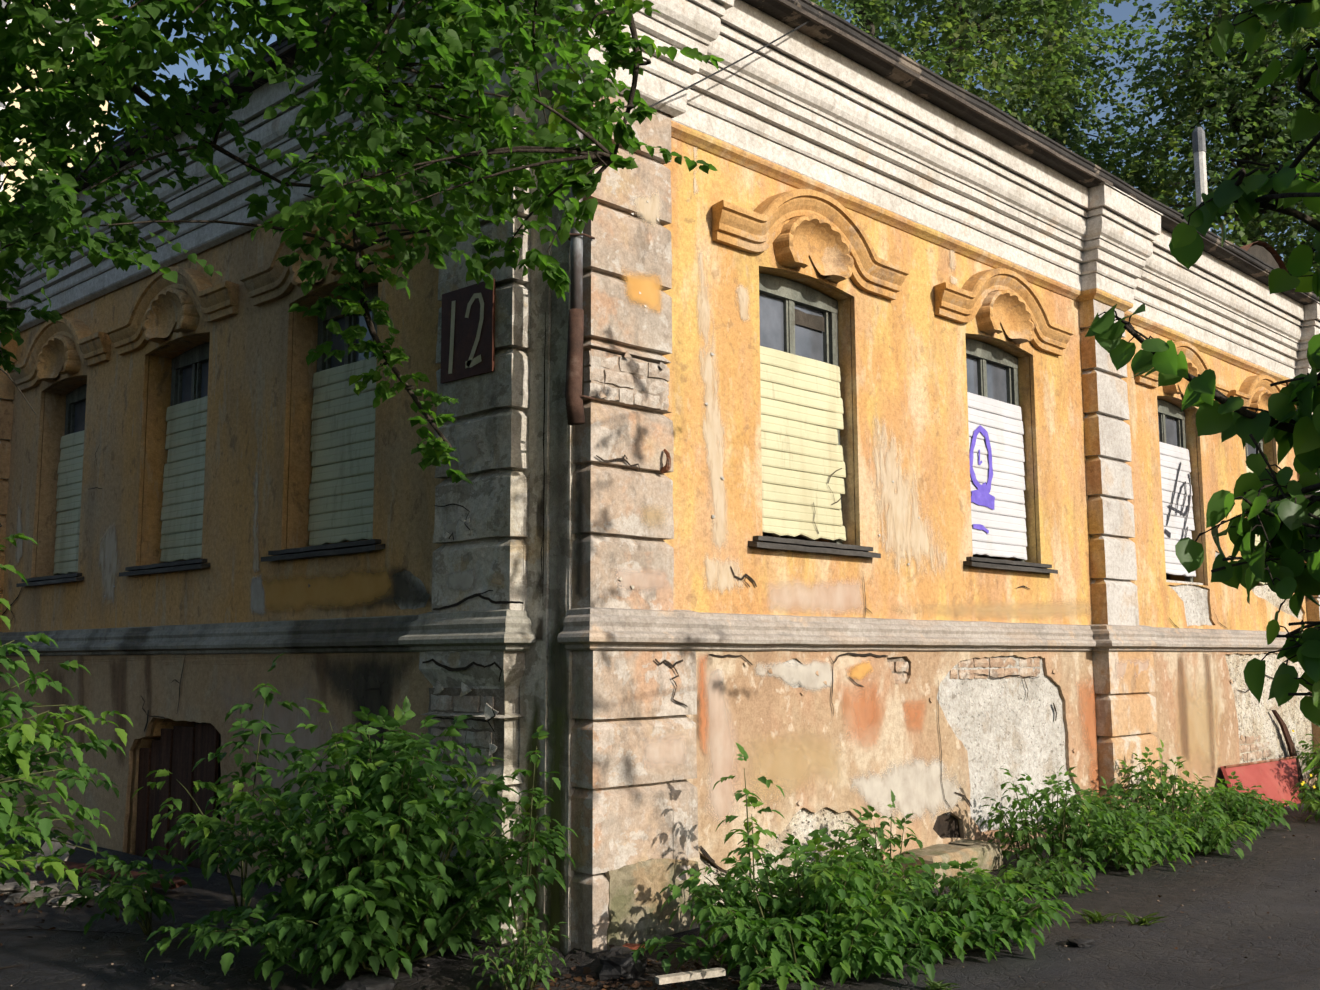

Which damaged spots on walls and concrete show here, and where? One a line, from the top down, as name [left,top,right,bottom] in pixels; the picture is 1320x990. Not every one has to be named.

peeling [631,194,660,225]
peeling [627,275,661,311]
spalling [583,349,670,411]
crack [433,312,546,610]
water stain [292,570,432,769]
crack [422,658,502,732]
crack [655,654,753,707]
peeling [744,658,832,696]
spalling [887,657,909,684]
spalling [930,655,1080,838]
spalling [1225,653,1315,779]
spalling [605,800,880,950]